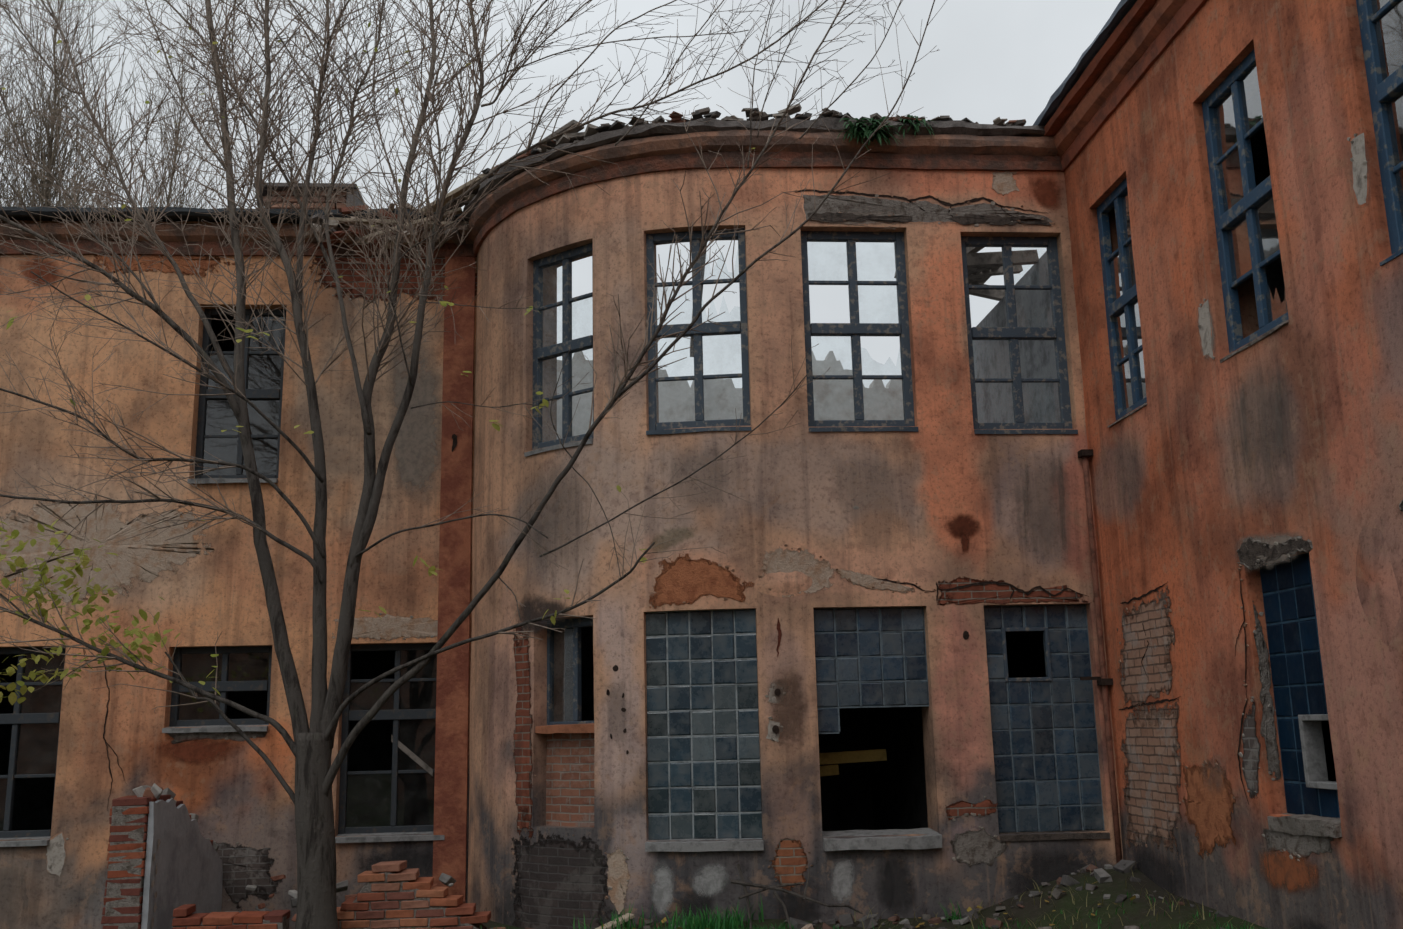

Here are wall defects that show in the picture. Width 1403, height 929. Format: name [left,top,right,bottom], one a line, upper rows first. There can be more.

spalling [802,171,1055,227]
peeling [649,544,915,609]
spalling [936,576,1094,606]
crack [103,661,126,811]
flaking render [1117,585,1281,859]
spalling [511,623,630,929]
spalling [768,838,813,891]
spalling [1262,829,1333,861]